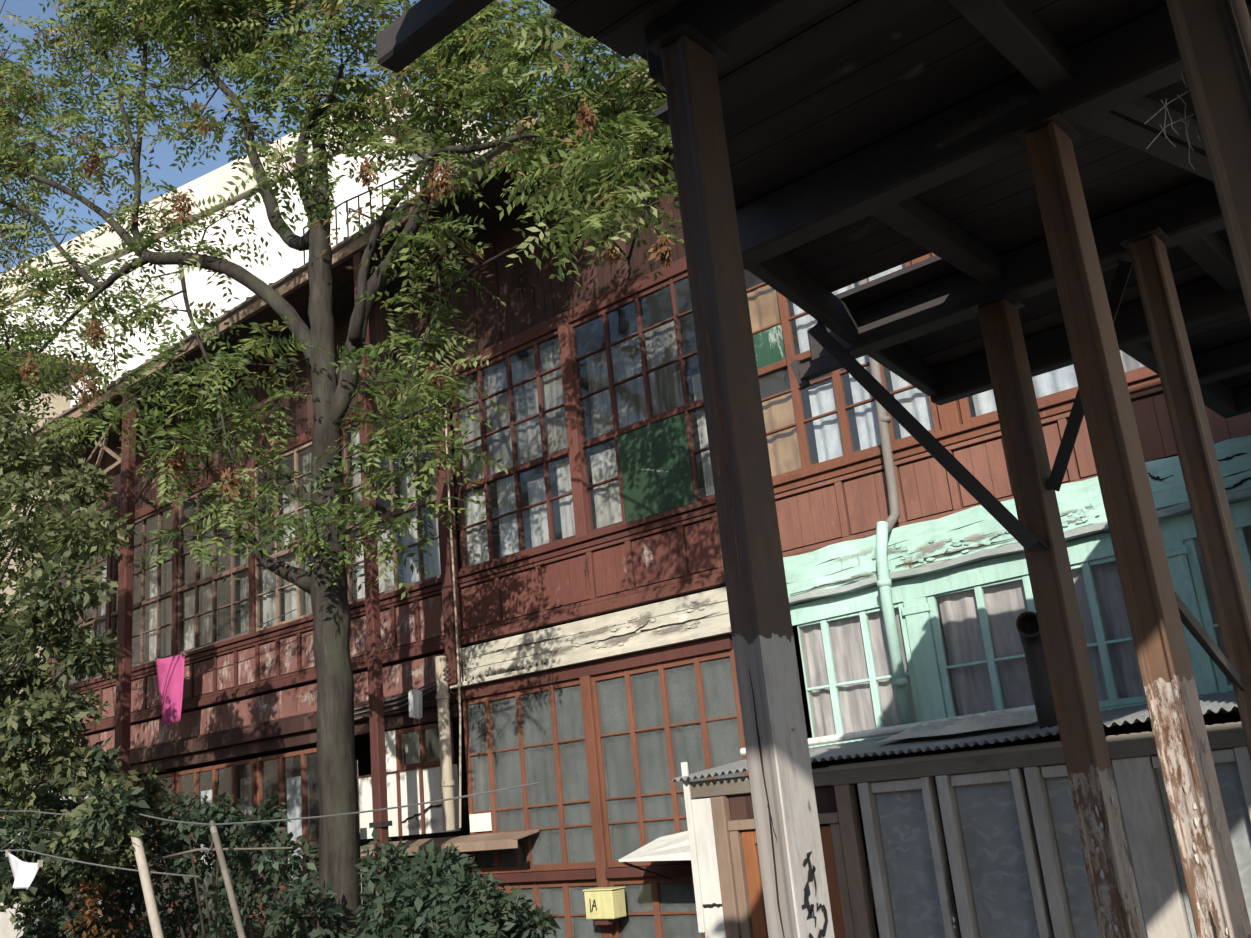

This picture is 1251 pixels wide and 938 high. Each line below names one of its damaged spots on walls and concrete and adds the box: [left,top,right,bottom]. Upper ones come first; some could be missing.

crack [1148,473,1174,482]
crack [1218,453,1251,490]
peeling [1062,503,1100,526]
peeling [813,529,1008,589]
peeling [495,599,717,660]
peeling [1088,806,1103,853]
peeling [1180,785,1199,828]
peeling [1098,870,1118,935]
peeling [1193,843,1251,938]